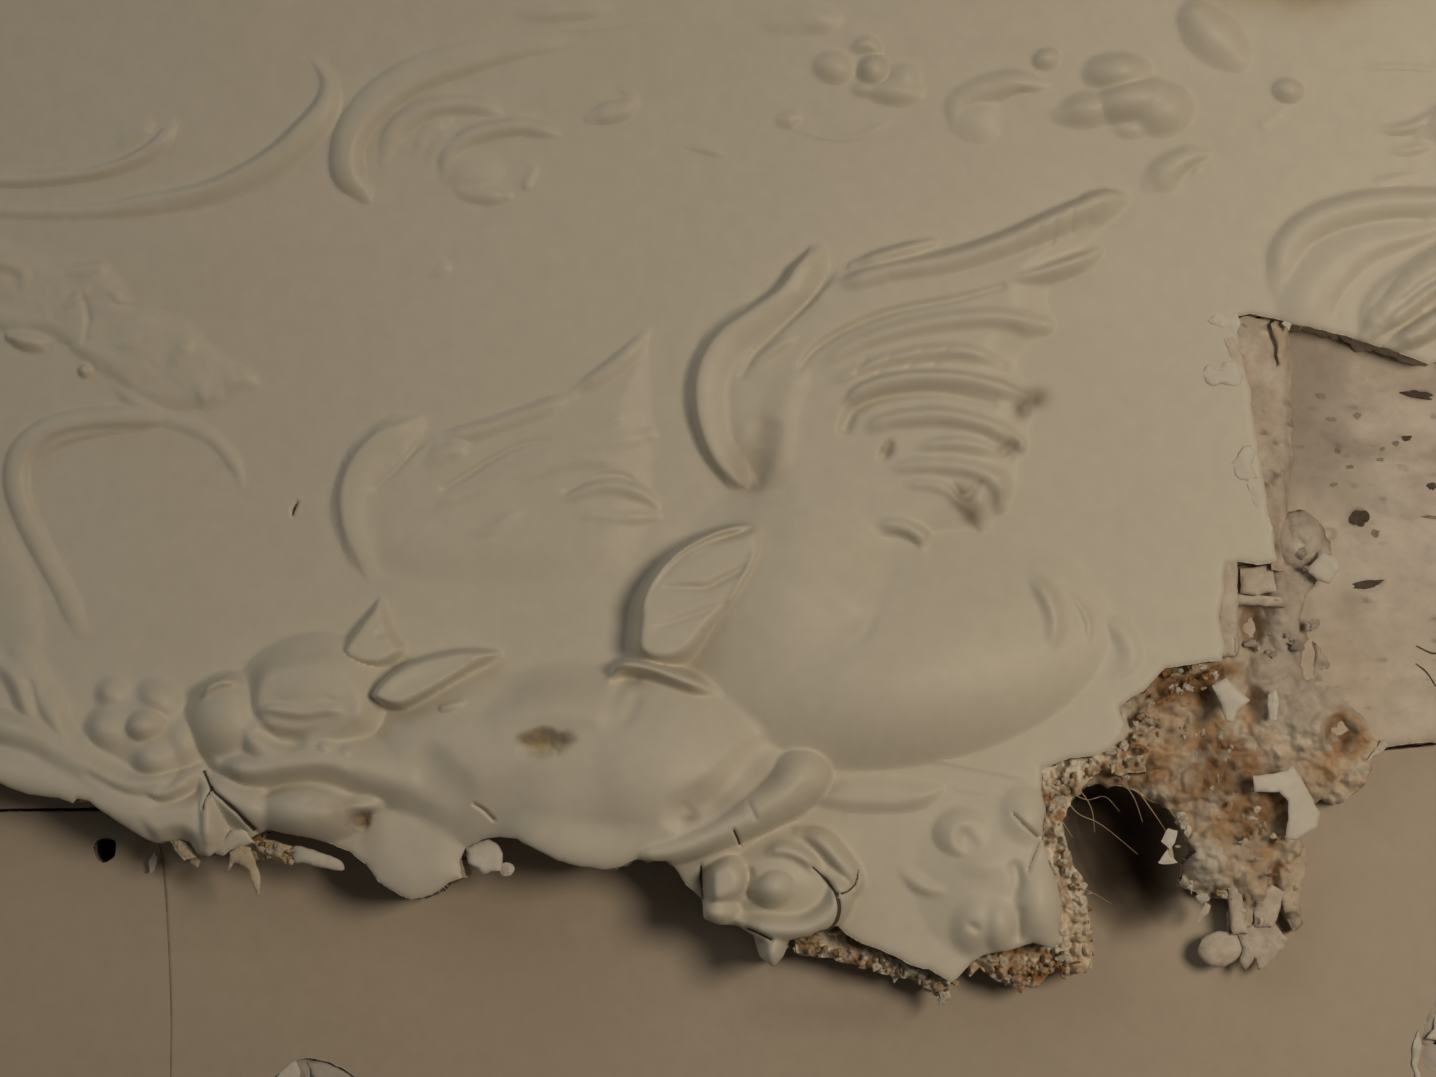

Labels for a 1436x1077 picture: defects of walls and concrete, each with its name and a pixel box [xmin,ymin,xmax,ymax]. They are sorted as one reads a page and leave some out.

flaking render [1066,316,1436,971]
crack [203,770,256,831]
spalling [94,839,116,862]
crack [697,866,705,899]
crack [812,867,859,932]
crack [747,928,772,940]